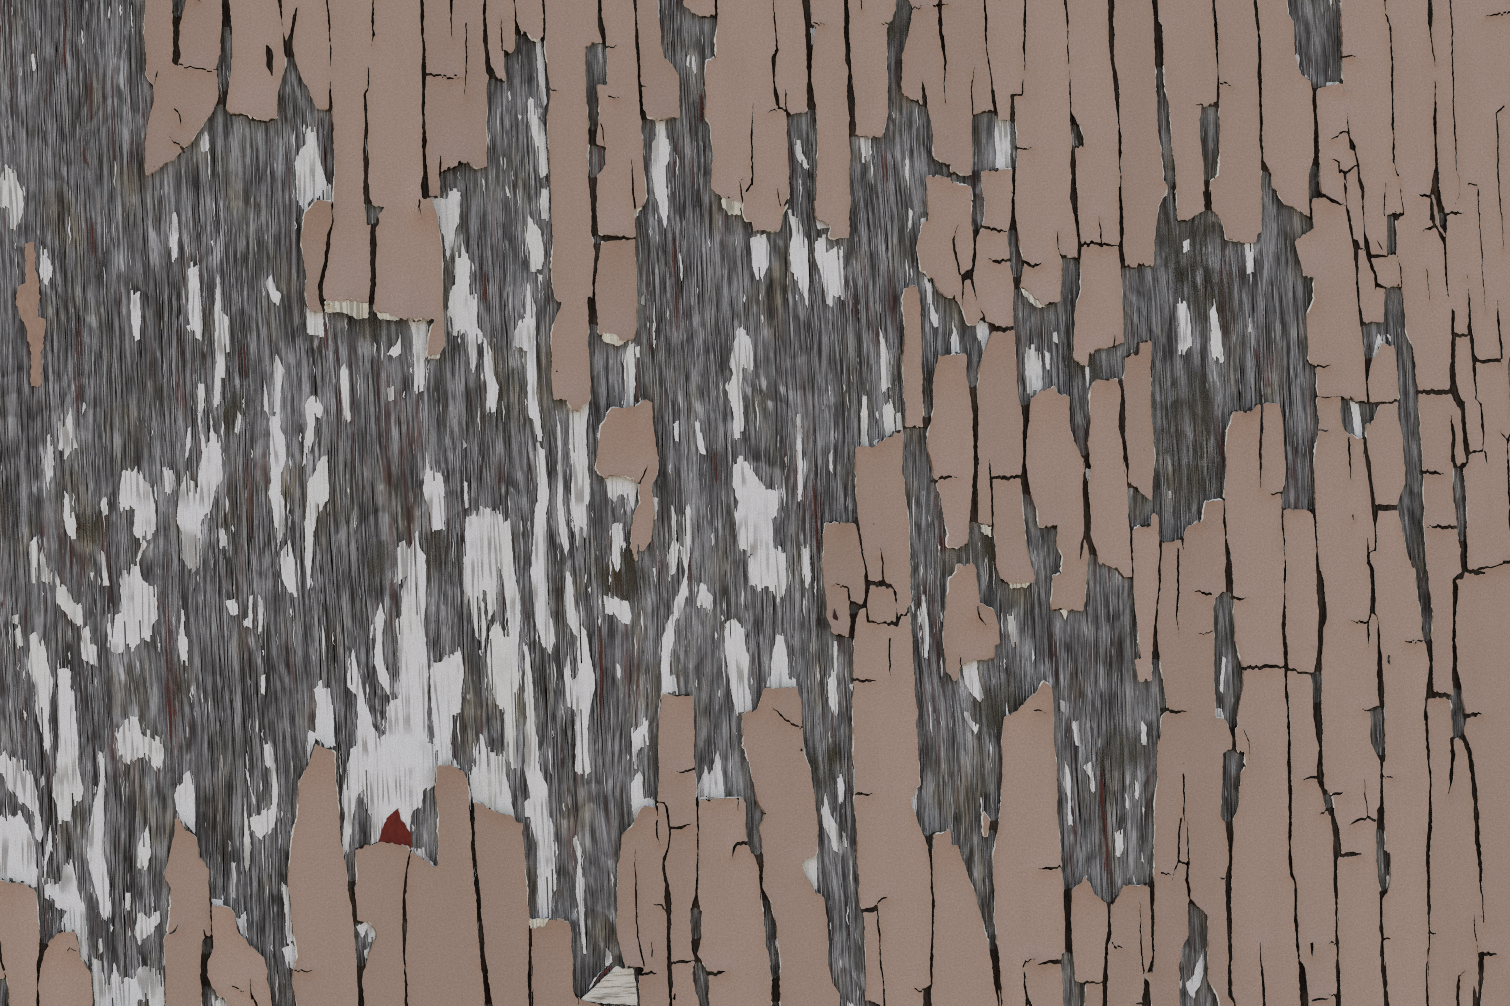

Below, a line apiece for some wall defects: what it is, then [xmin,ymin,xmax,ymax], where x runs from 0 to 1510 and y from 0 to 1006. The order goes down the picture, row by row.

crack [266,0,379,313]
crack [418,0,546,213]
crack [587,0,649,326]
crack [721,0,862,214]
crack [910,0,1151,333]
peeling [1007,67,1321,543]
peeling [0,0,1166,1006]
crack [931,336,1244,661]
peeling [1213,592,1243,727]
crack [989,0,1510,1006]
peeling [1312,672,1322,703]
crack [634,767,771,1006]